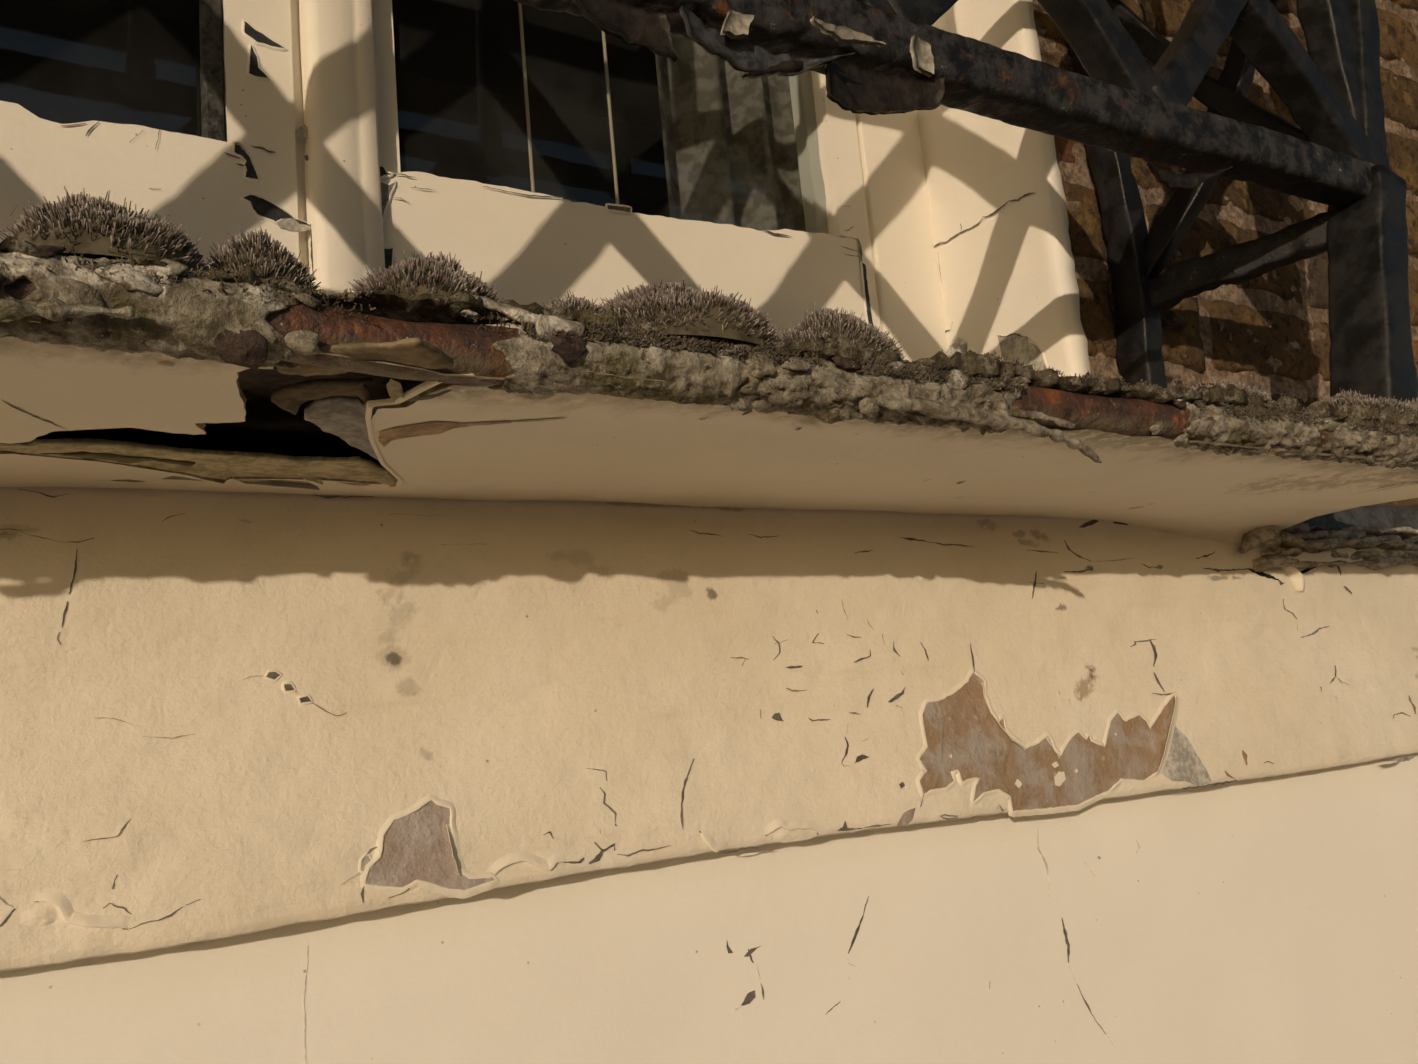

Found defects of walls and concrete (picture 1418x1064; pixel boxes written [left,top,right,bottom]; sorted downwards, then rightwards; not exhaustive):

peeling [241,20,288,81]
peeling [225,140,314,277]
crack [934,193,1034,281]
peeling [290,292,322,309]
spalling [0,329,475,490]
crack [1026,540,1163,599]
crack [1196,552,1352,638]
crack [1131,639,1172,696]
peeling [838,644,1238,831]
crack [1225,751,1274,780]
peeling [341,794,500,902]
crack [1037,829,1117,1052]